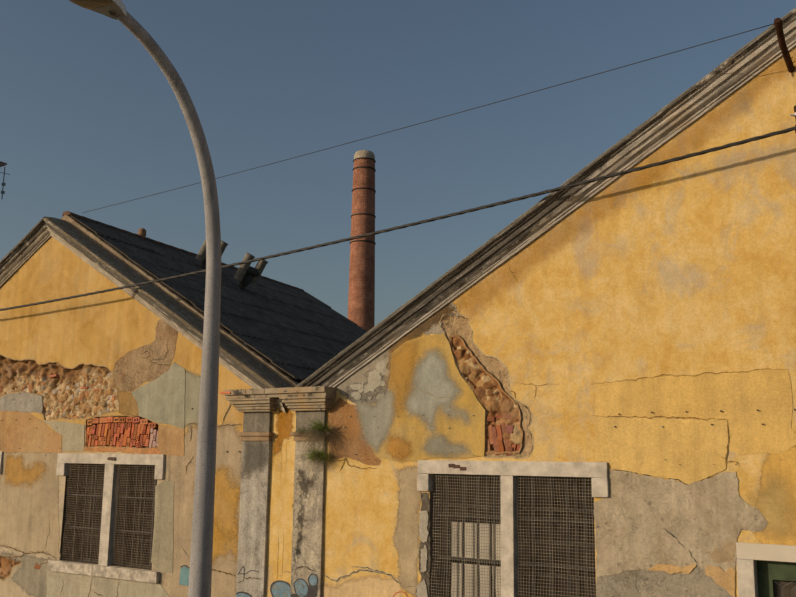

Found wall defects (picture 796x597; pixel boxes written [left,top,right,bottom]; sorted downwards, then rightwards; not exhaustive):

flaking render [0,319,178,454]
peeling [346,357,391,403]
flaking render [438,311,534,459]
crack [594,368,788,384]
leakage [241,408,293,475]
crack [592,415,738,485]
leakage [212,467,239,564]
leakage [292,470,316,562]
crack [212,568,261,583]
crack [285,566,417,588]
flaking render [648,541,735,597]